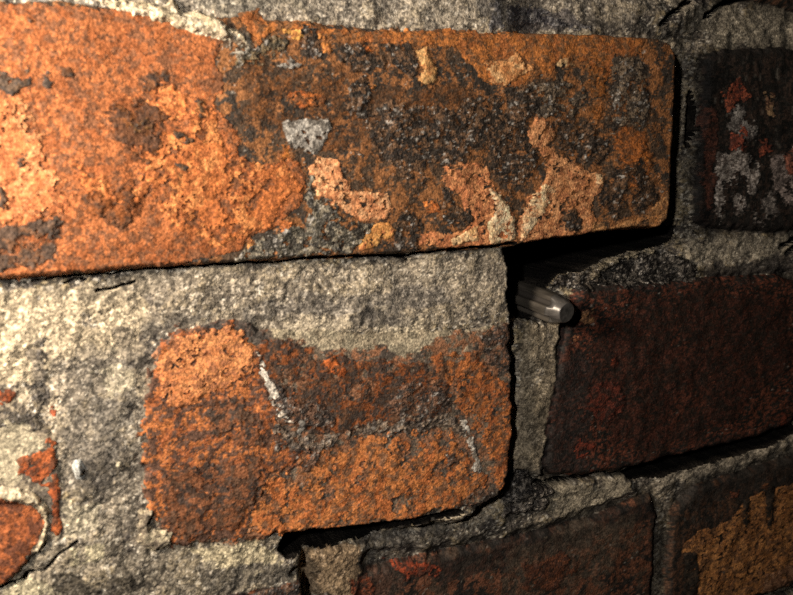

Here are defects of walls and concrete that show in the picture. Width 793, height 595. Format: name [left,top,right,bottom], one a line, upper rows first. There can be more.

crack [33,241,517,291]
crack [534,471,619,483]